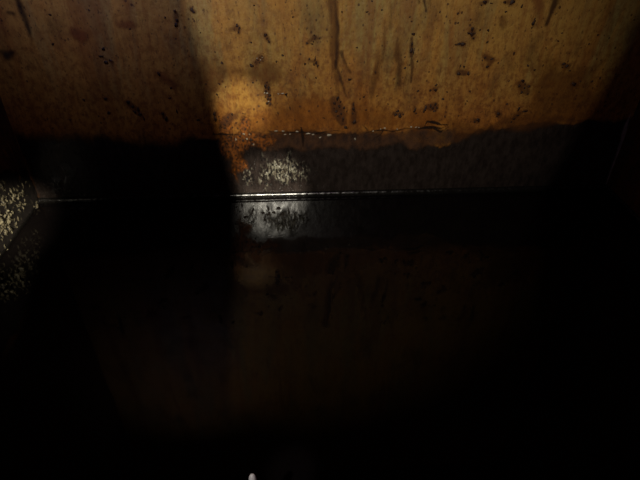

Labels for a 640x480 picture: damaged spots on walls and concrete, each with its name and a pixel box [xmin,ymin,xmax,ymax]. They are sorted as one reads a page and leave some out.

rust [219,117,276,176]
crack [419,121,447,132]
damp [0,118,631,254]